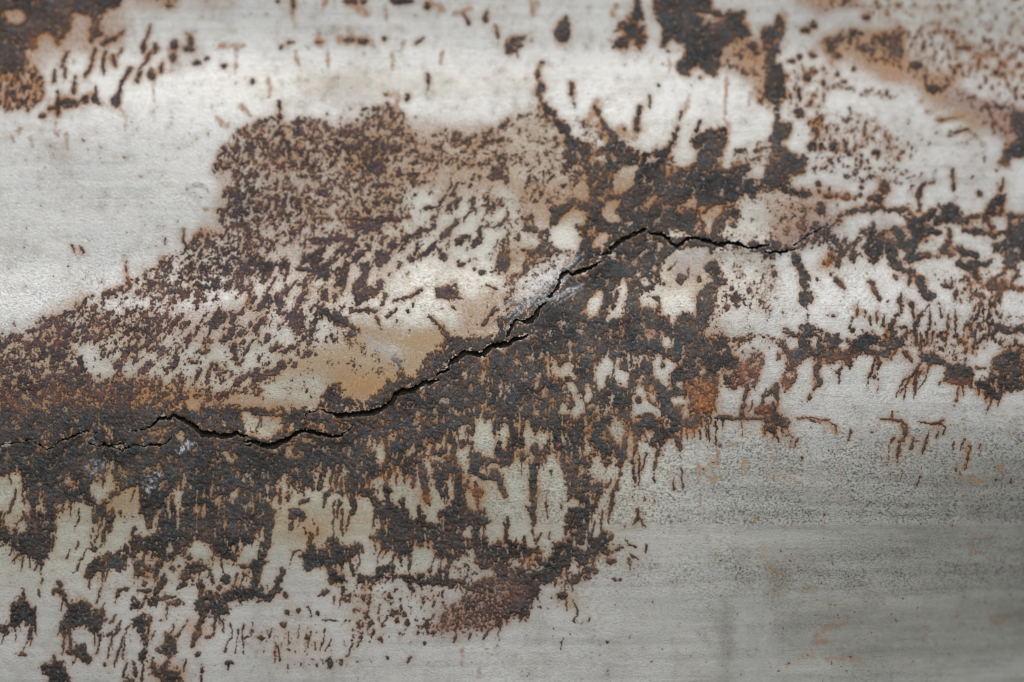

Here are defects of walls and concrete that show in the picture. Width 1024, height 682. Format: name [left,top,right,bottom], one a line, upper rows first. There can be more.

corrosion [0,0,246,147]
corrosion [275,0,369,17]
corrosion [273,26,387,66]
crack [0,224,829,452]
corrosion [828,410,1012,498]